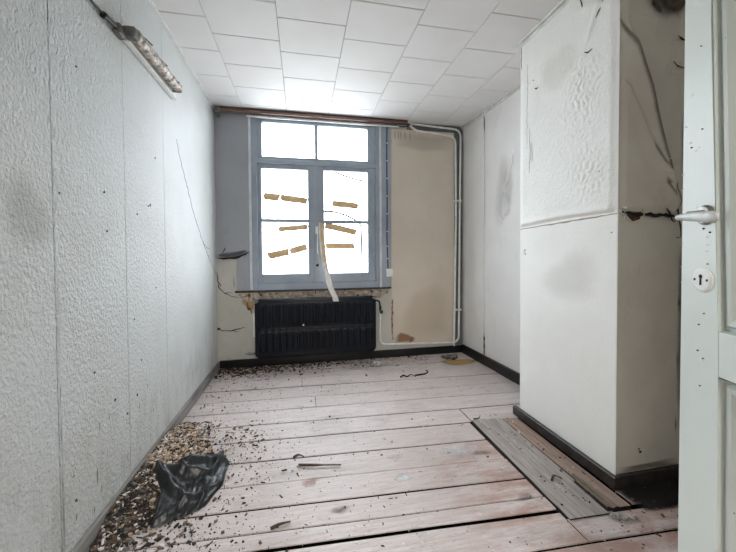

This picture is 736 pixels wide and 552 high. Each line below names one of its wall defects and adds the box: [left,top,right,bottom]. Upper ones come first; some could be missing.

crack [177,144,250,332]
crack [622,208,681,238]
spalling [238,289,389,302]